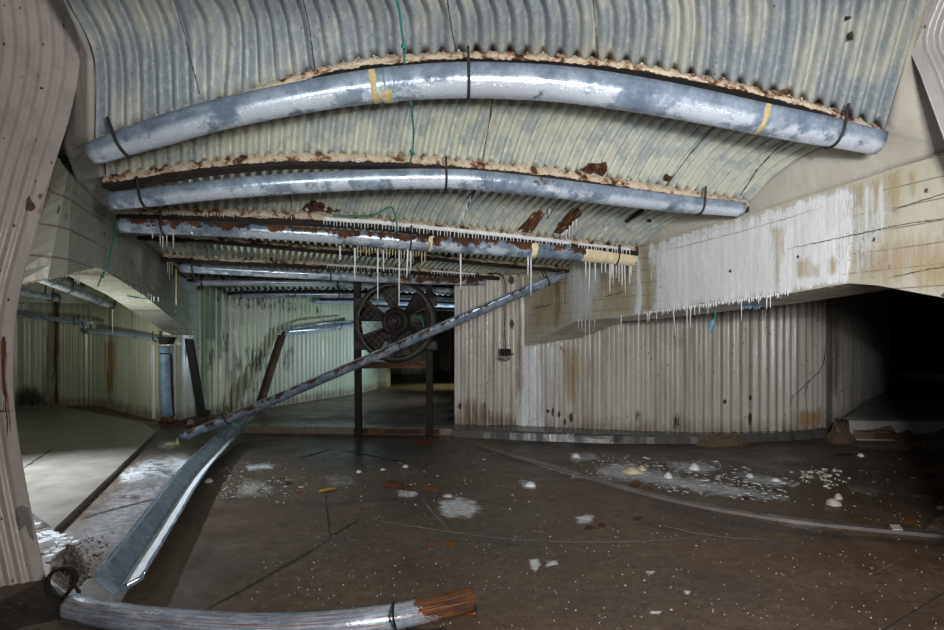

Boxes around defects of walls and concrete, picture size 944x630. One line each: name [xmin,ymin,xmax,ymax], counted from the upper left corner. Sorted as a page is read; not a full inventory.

corrosion [579,162,607,177]
corrosion [518,210,545,233]
corrosion [554,207,581,234]
corrosion [1,337,10,437]
leakage [15,315,52,407]
leakage [105,309,115,398]
leakage [150,329,161,420]
leakage [323,178,944,448]
crack [205,494,774,610]